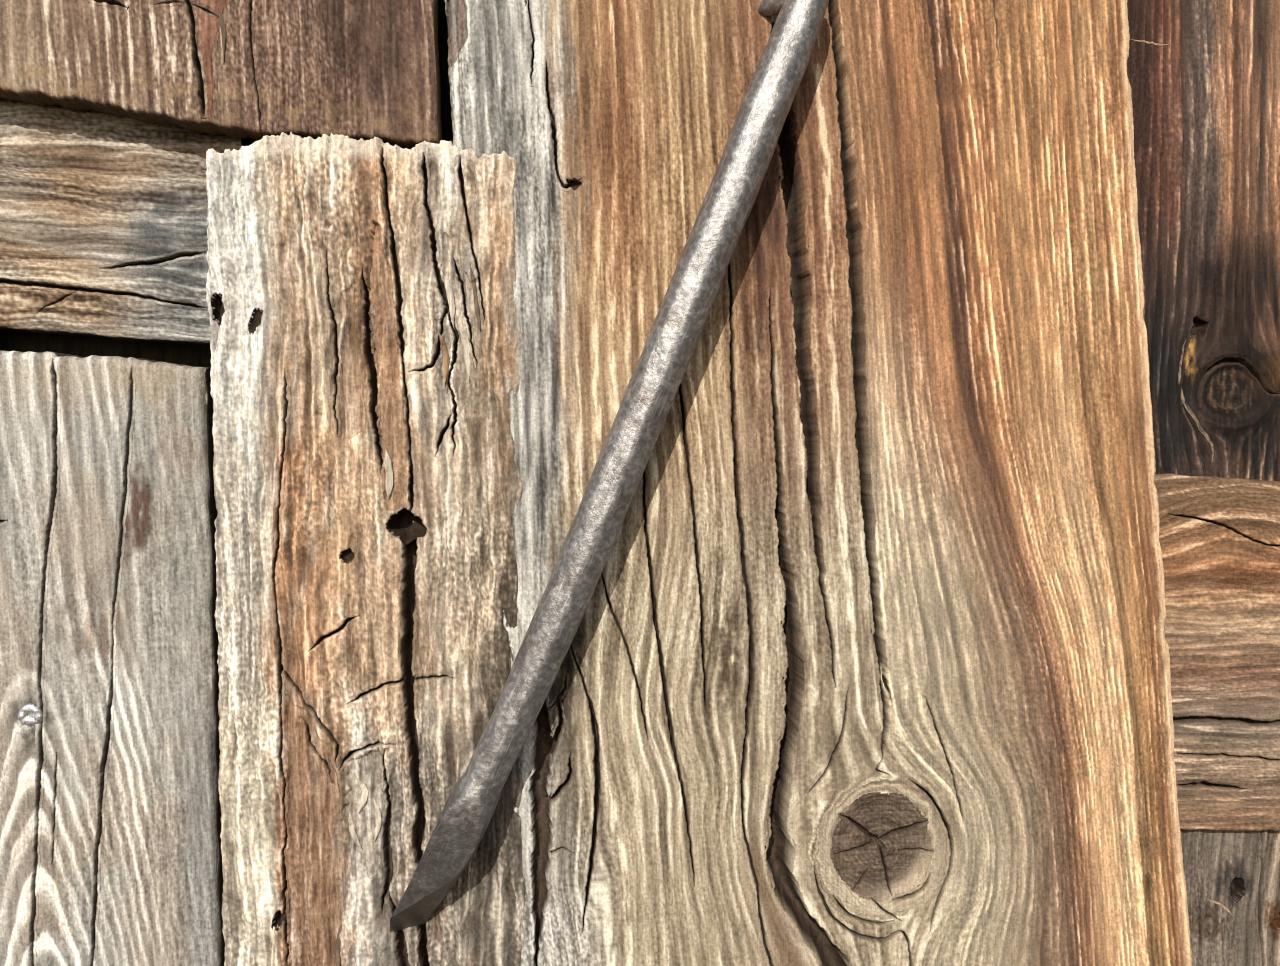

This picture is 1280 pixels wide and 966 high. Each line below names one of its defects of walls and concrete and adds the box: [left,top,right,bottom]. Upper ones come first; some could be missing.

crack [86,0,264,129]
crack [522,0,584,192]
crack [0,249,207,316]
crack [269,146,488,966]
crack [599,377,710,887]
crack [725,0,967,966]
crack [1168,511,1280,550]
crack [525,641,604,966]
crack [1173,714,1280,793]